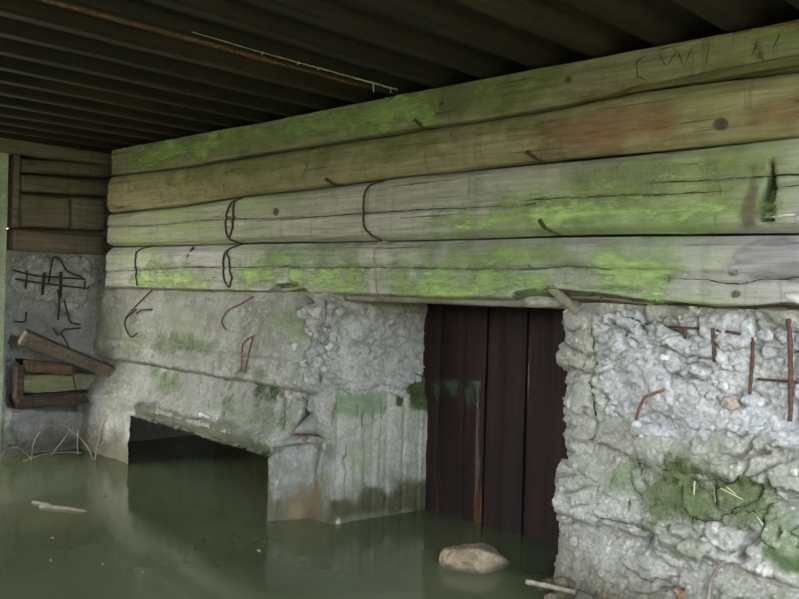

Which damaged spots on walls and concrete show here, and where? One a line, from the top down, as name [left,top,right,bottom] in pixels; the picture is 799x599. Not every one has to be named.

crack [284,387,322,438]
spalling [276,282,427,393]
spalling [513,288,799,446]
water stain [328,482,426,520]